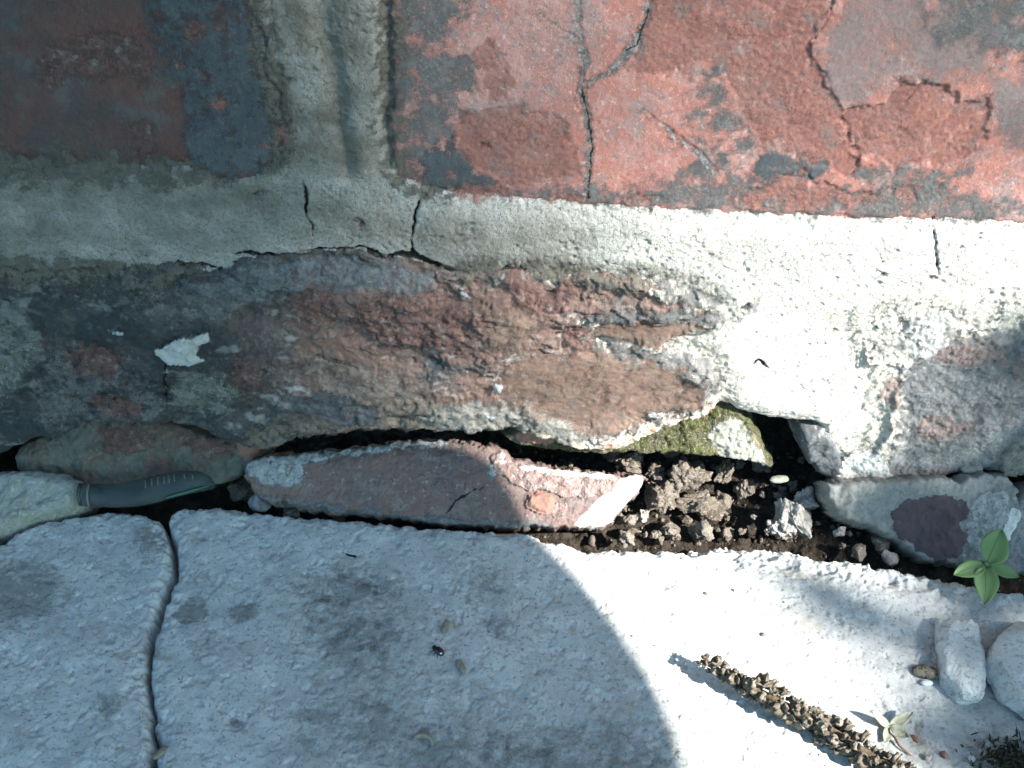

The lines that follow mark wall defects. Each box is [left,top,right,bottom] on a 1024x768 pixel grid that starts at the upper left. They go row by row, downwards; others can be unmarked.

crack [805,0,835,99]
crack [539,0,652,203]
crack [304,185,454,271]
crack [177,250,275,273]
spalling [505,266,579,314]
spalling [59,341,124,381]
peeling [154,333,210,367]
spalling [354,282,497,374]
spalling [514,400,719,450]